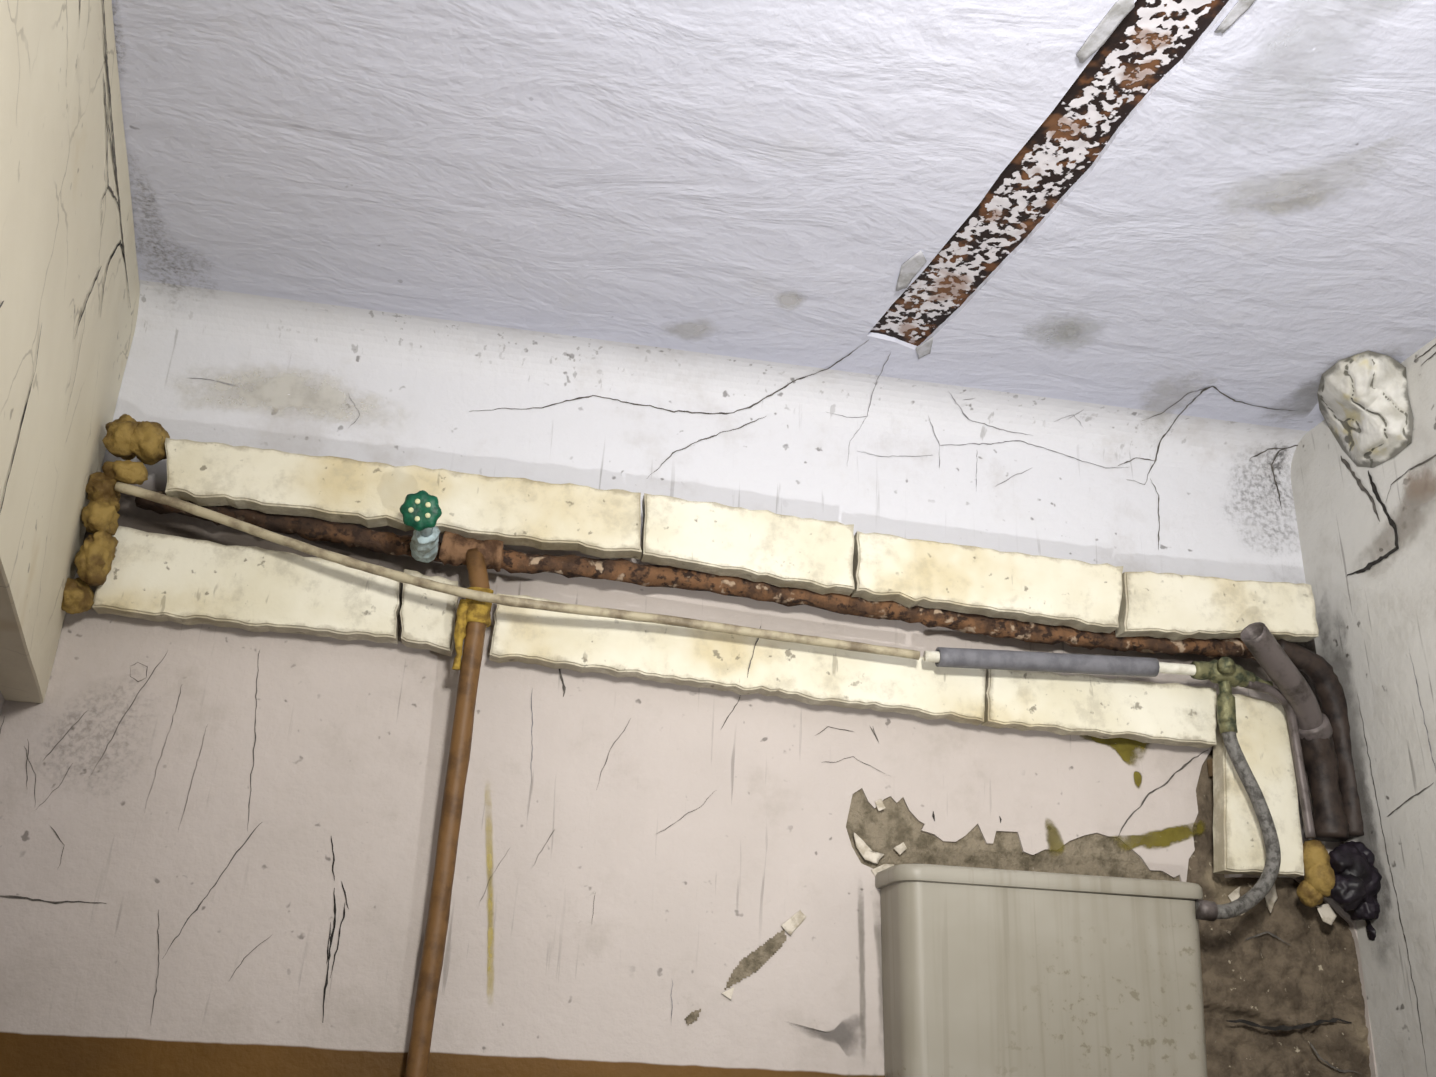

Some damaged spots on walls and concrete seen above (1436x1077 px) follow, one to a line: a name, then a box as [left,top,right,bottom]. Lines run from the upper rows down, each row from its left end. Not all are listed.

crack [0,0,131,512]
crack [469,341,1298,550]
spalling [870,0,1255,359]
crack [1341,454,1436,576]
crack [1414,344,1436,363]
spalling [846,750,1371,1077]